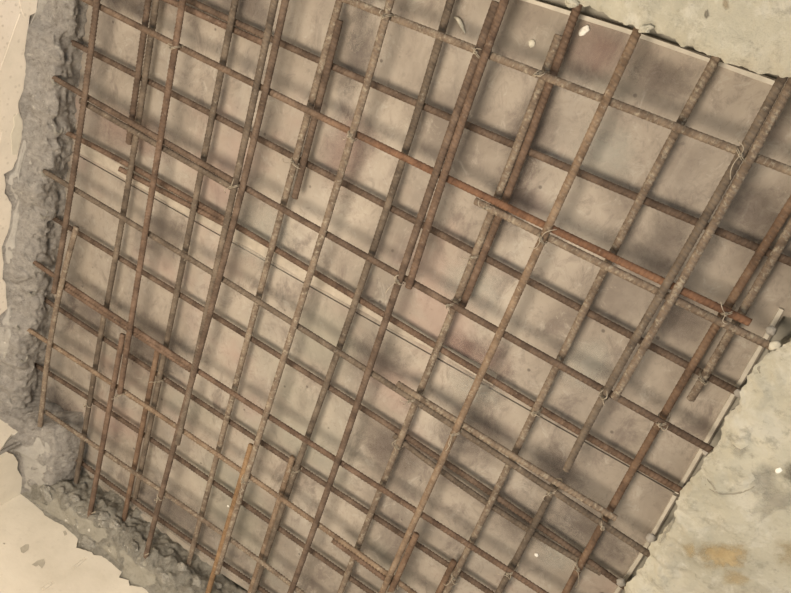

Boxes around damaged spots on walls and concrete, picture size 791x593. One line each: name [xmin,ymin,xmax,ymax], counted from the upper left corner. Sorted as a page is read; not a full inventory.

spalling [0,0,385,593]
spalling [164,0,509,536]
spalling [287,4,791,593]